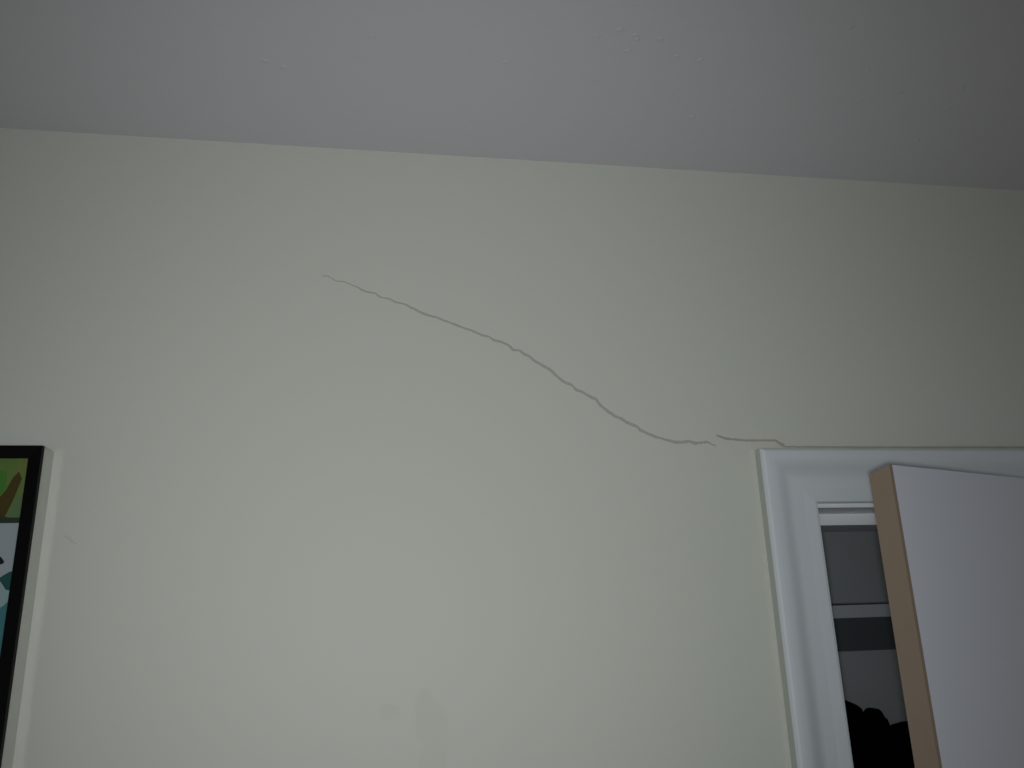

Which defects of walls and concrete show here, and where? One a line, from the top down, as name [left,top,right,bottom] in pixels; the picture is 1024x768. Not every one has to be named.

crack [322,275,1024,448]